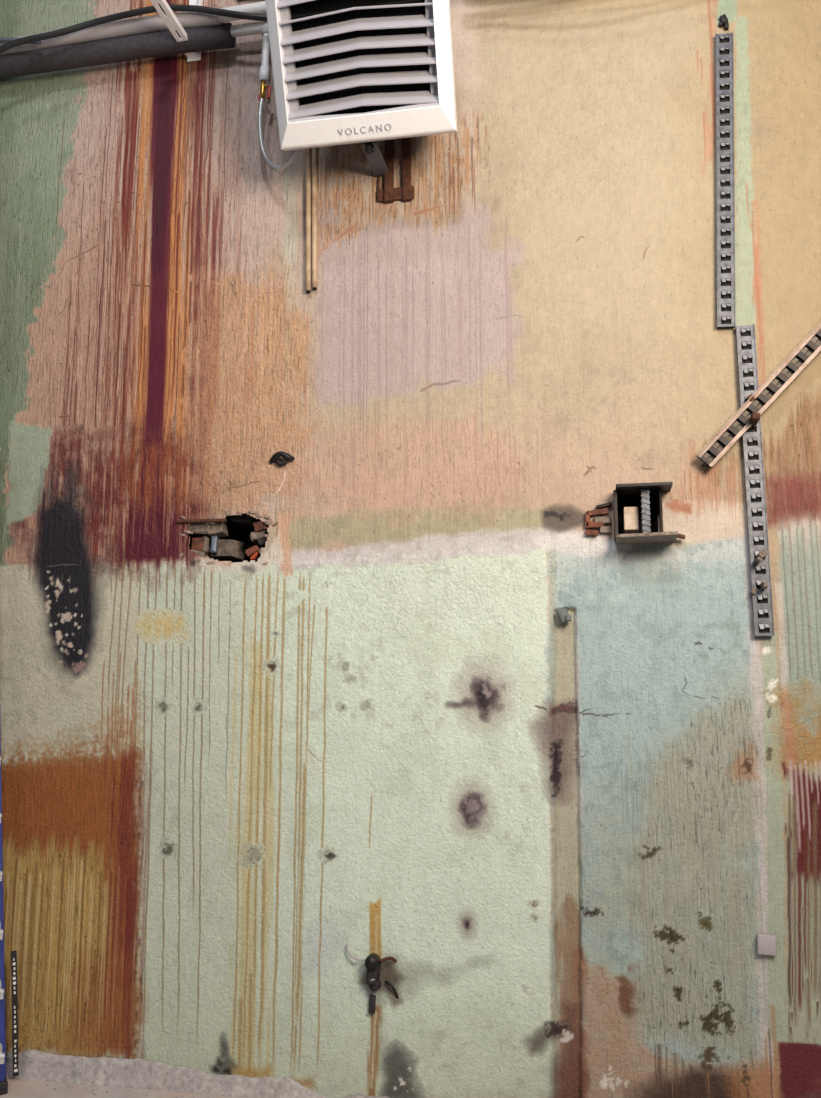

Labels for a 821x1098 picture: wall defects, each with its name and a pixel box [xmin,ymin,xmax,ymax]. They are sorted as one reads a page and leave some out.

corrosion [128,0,189,19]
corrosion [203,0,231,9]
corrosion [35,48,247,593]
corrosion [7,517,36,578]
spalling [177,510,286,576]
leakage [107,192,545,1092]
corrosion [1,650,154,1060]
corrosion [548,676,821,1098]
leakage [620,688,770,1081]